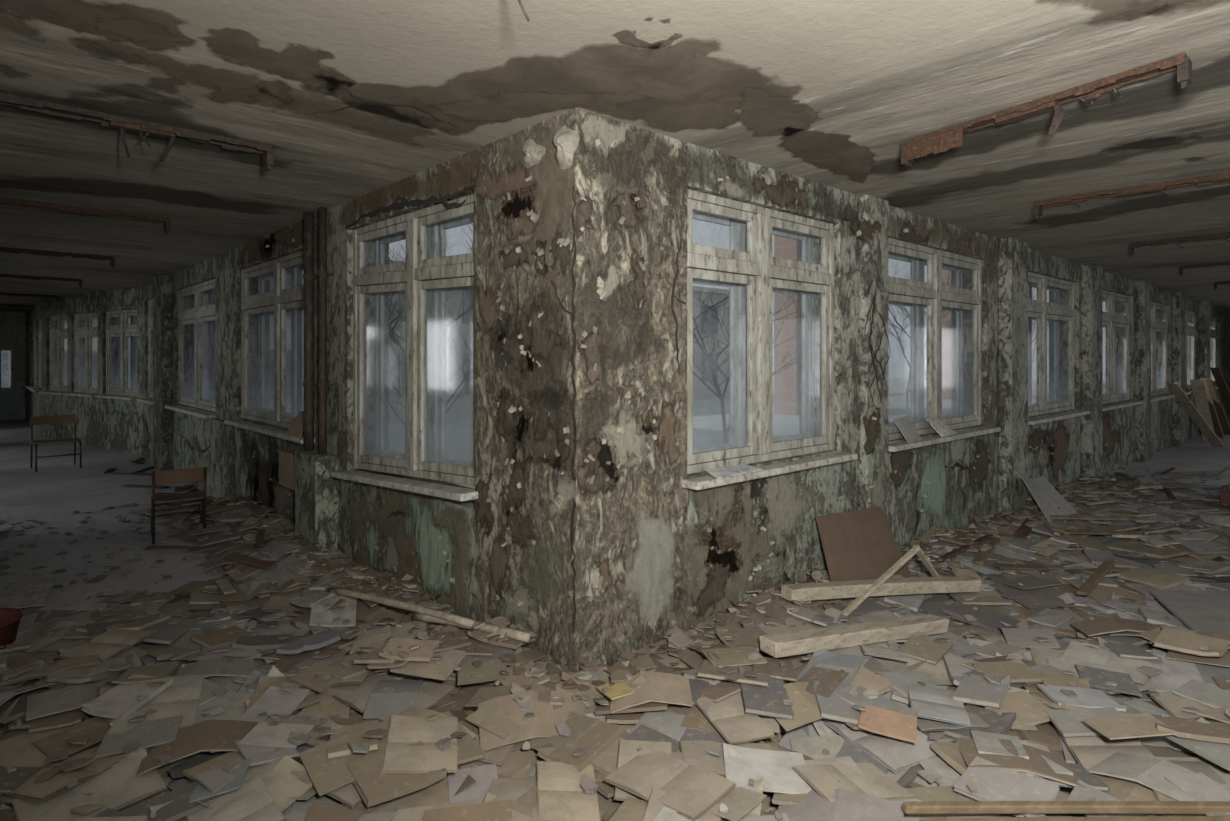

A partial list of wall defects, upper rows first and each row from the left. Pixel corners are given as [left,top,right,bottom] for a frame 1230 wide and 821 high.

peeling [580,112,632,160]
peeling [1028,420,1070,486]
leakage [348,487,470,619]
peeling [668,470,826,620]